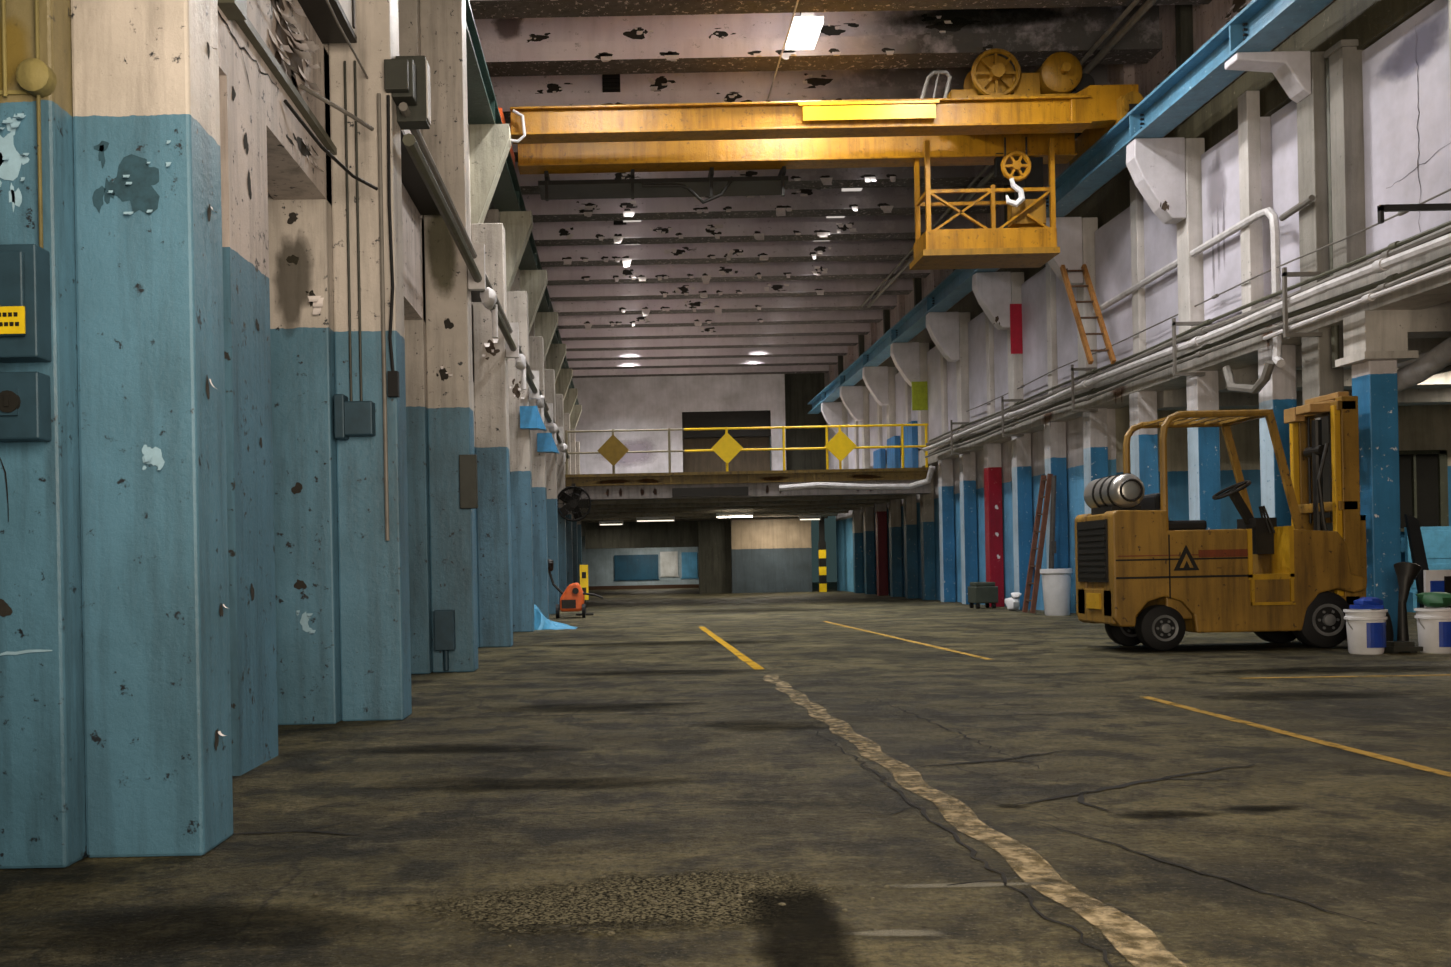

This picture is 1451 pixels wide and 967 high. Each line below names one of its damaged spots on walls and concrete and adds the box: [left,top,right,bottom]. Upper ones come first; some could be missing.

peeling [0,113,30,212]
peeling [92,141,171,215]
crack [645,695,1377,967]